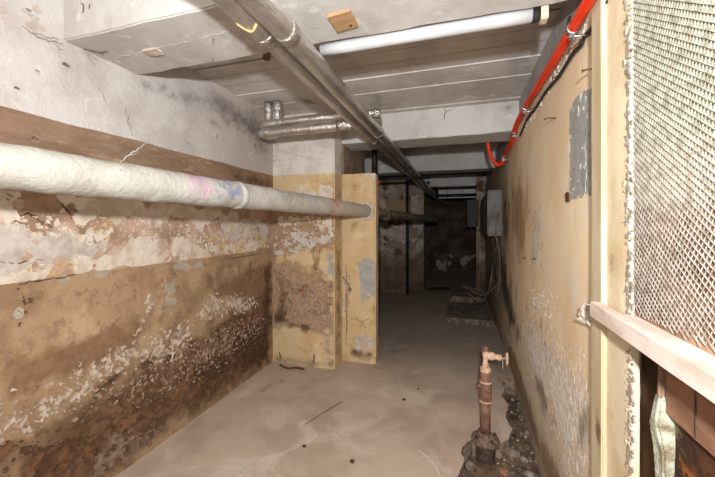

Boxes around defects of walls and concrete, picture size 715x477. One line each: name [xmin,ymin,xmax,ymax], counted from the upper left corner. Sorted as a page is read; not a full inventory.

crack [21,25,64,51]
crack [120,113,147,162]
flaking render [569,87,592,200]
peeling [292,184,334,198]
peeling [0,190,334,327]
peeling [343,257,375,315]
peeling [436,254,475,271]
water stain [0,211,339,477]
peeling [355,334,375,352]
water stain [500,252,591,477]